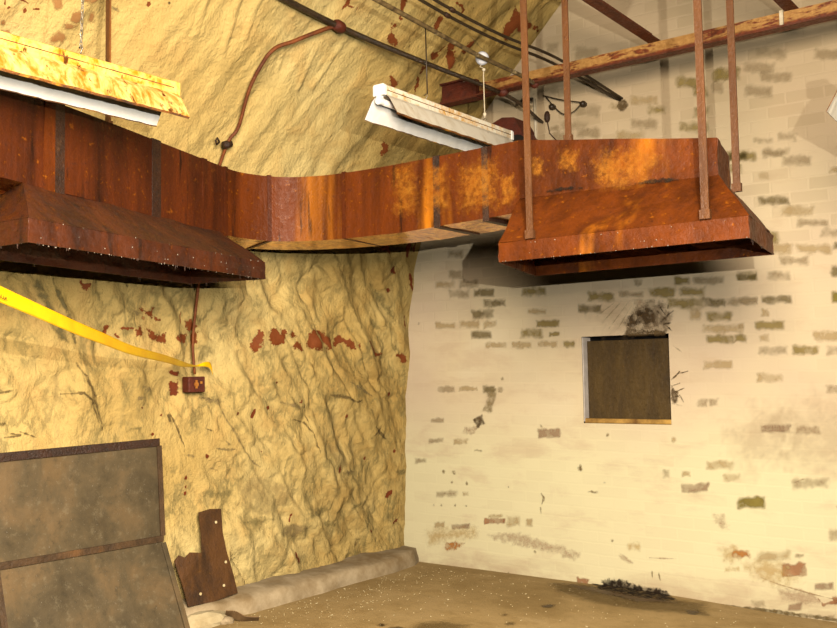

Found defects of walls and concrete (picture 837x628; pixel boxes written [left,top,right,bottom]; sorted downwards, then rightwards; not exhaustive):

flaking render [678,69,729,94]
flaking render [759,197,792,213]
flaking render [800,244,837,262]
flaking render [579,293,613,312]
leakage [625,305,670,336]
flaking render [651,277,791,343]
spalling [760,554,805,576]
leakage [574,577,675,602]